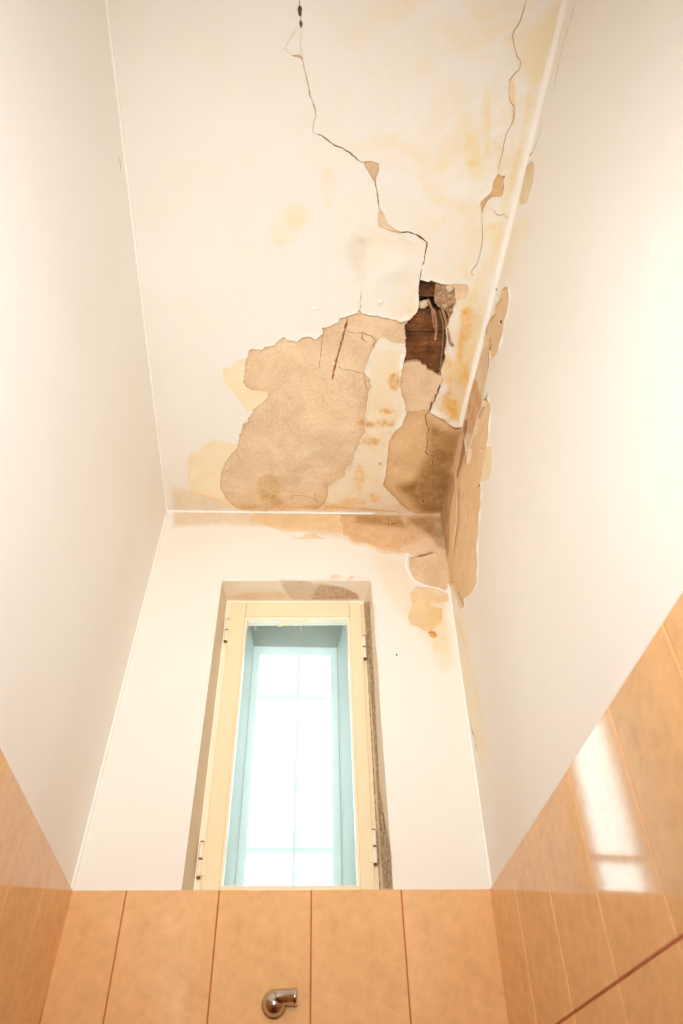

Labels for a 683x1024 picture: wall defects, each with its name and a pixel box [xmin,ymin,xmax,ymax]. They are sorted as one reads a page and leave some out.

crack [284,0,379,205]
crack [498,2,526,169]
crack [402,231,428,280]
spalling [483,287,509,359]
spalling [188,282,492,638]